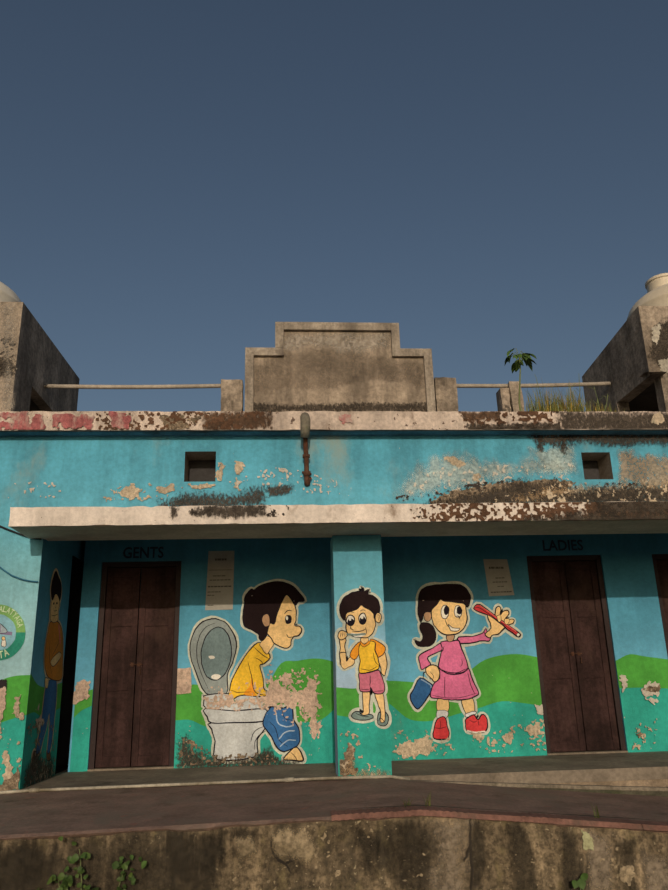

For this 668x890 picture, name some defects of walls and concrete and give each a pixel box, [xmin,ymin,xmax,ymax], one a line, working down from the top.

peeling [103,461,349,502]
spalling [396,450,668,504]